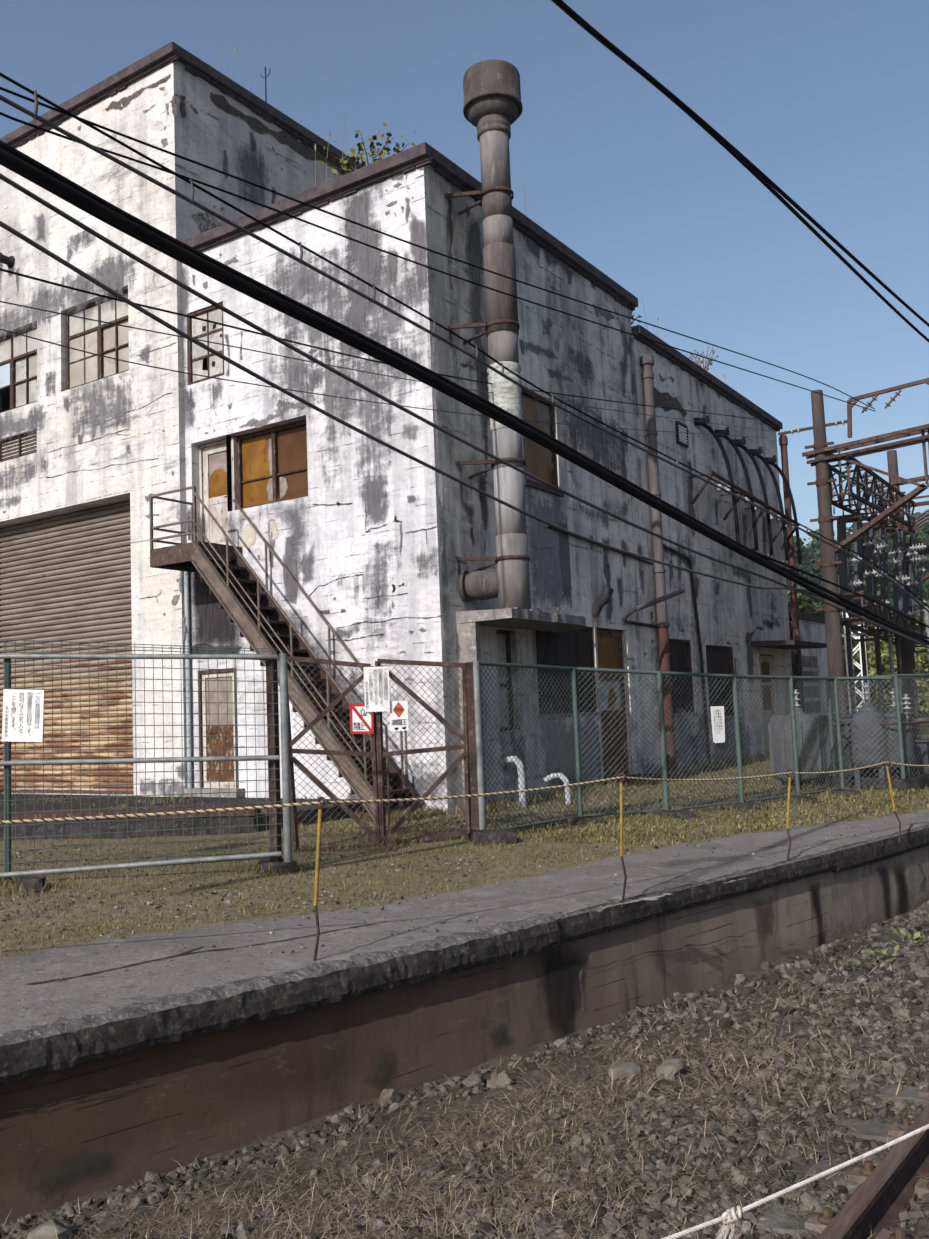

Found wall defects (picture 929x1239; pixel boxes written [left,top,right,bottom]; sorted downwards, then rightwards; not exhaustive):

peeling [105,74,199,147]
peeling [210,92,347,175]
leakage [266,173,434,371]
leakage [466,219,488,476]
leakage [0,406,44,441]
leakage [64,377,132,443]
leakage [270,314,416,523]
leakage [0,460,46,519]
leakage [811,868,929,947]
crack [27,921,387,985]
leakage [544,953,583,1035]